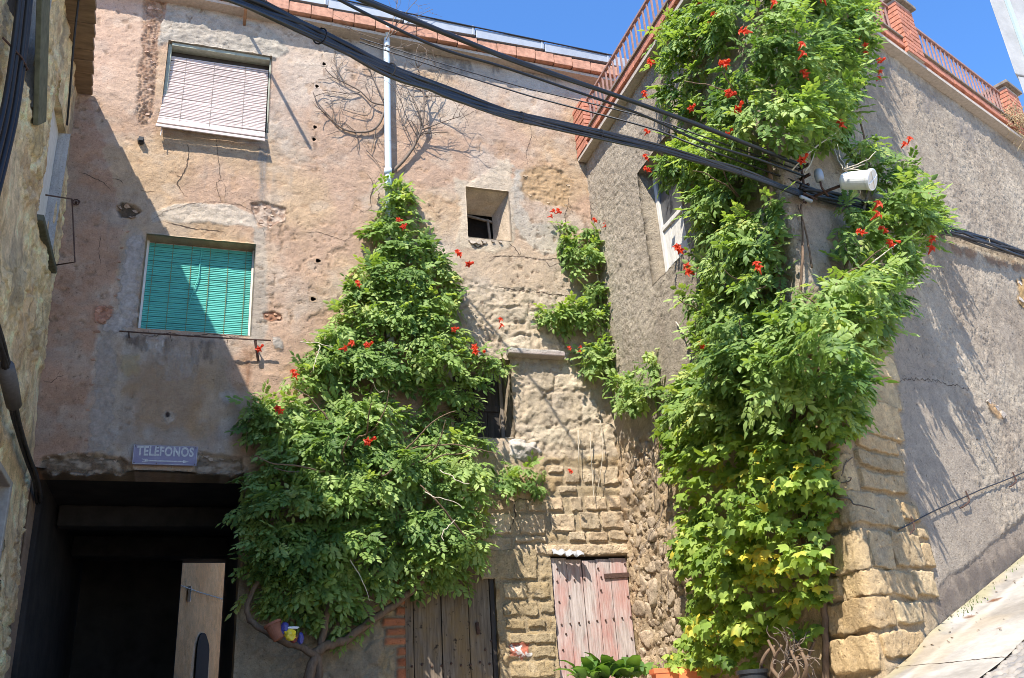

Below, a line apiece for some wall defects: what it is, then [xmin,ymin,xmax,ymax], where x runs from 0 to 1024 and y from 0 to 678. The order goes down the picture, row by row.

crack [79,141,266,238]
spalling [116,203,139,219]
spalling [250,202,286,228]
spalling [45,452,127,476]
spalling [197,451,242,477]